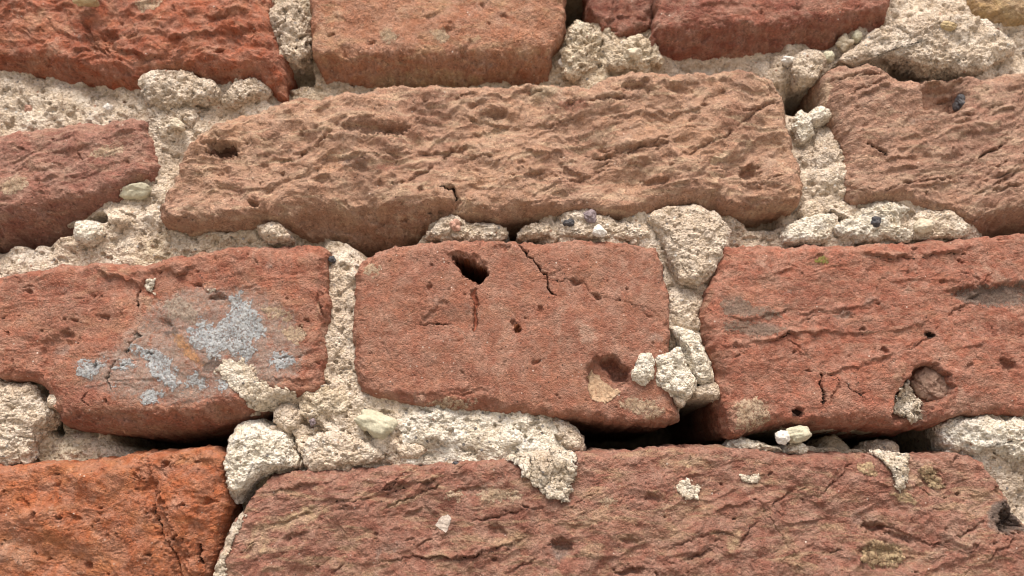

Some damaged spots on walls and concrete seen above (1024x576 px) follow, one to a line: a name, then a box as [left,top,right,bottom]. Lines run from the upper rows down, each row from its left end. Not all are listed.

damp [74,290,307,405]
spalling [587,370,621,404]